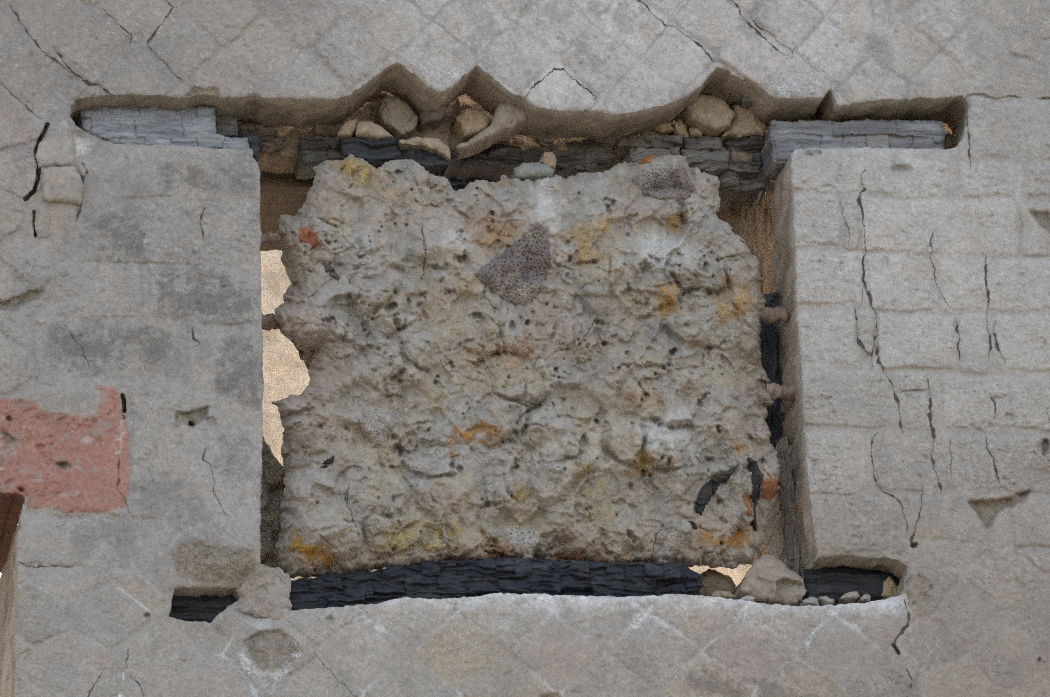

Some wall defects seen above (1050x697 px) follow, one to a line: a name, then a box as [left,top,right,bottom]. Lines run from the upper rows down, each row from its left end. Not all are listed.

crack [2,83,48,236]
crack [840,169,952,547]
crack [87,648,144,697]
crack [894,599,912,696]